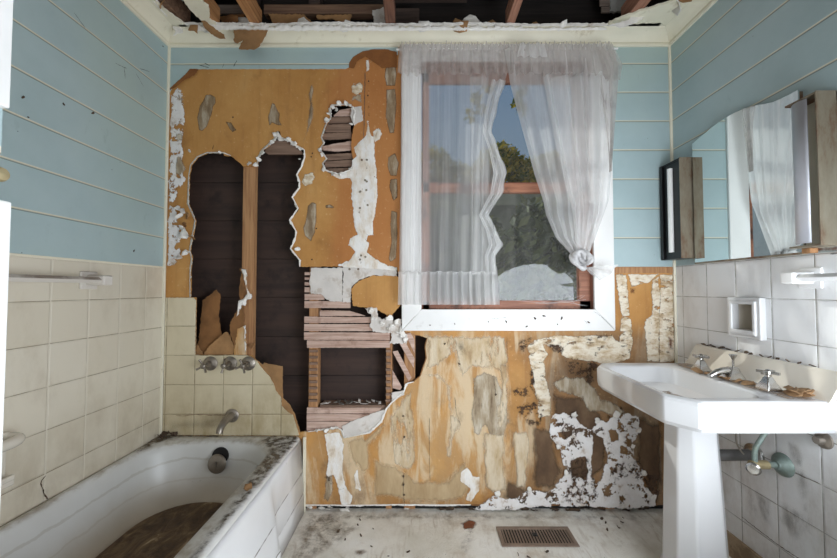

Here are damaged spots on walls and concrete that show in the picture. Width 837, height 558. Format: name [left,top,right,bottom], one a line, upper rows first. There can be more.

peeling [172,20,268,50]
peeling [167,88,231,298]
spalling [247,100,363,267]
spalling [309,259,408,344]
spalling [308,339,427,438]
flaking render [476,410,657,511]